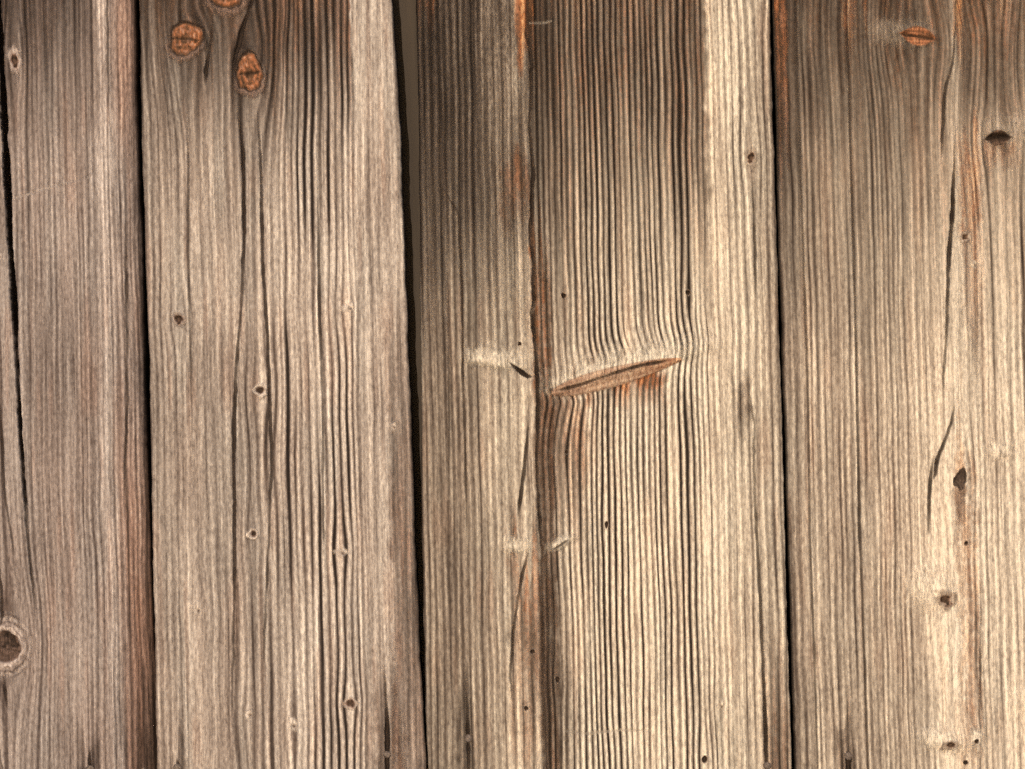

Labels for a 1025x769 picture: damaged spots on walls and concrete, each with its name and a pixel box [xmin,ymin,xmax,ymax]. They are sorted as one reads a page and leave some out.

crack [0,574,8,624]
crack [0,0,34,585]
crack [510,0,664,681]
crack [927,413,953,527]